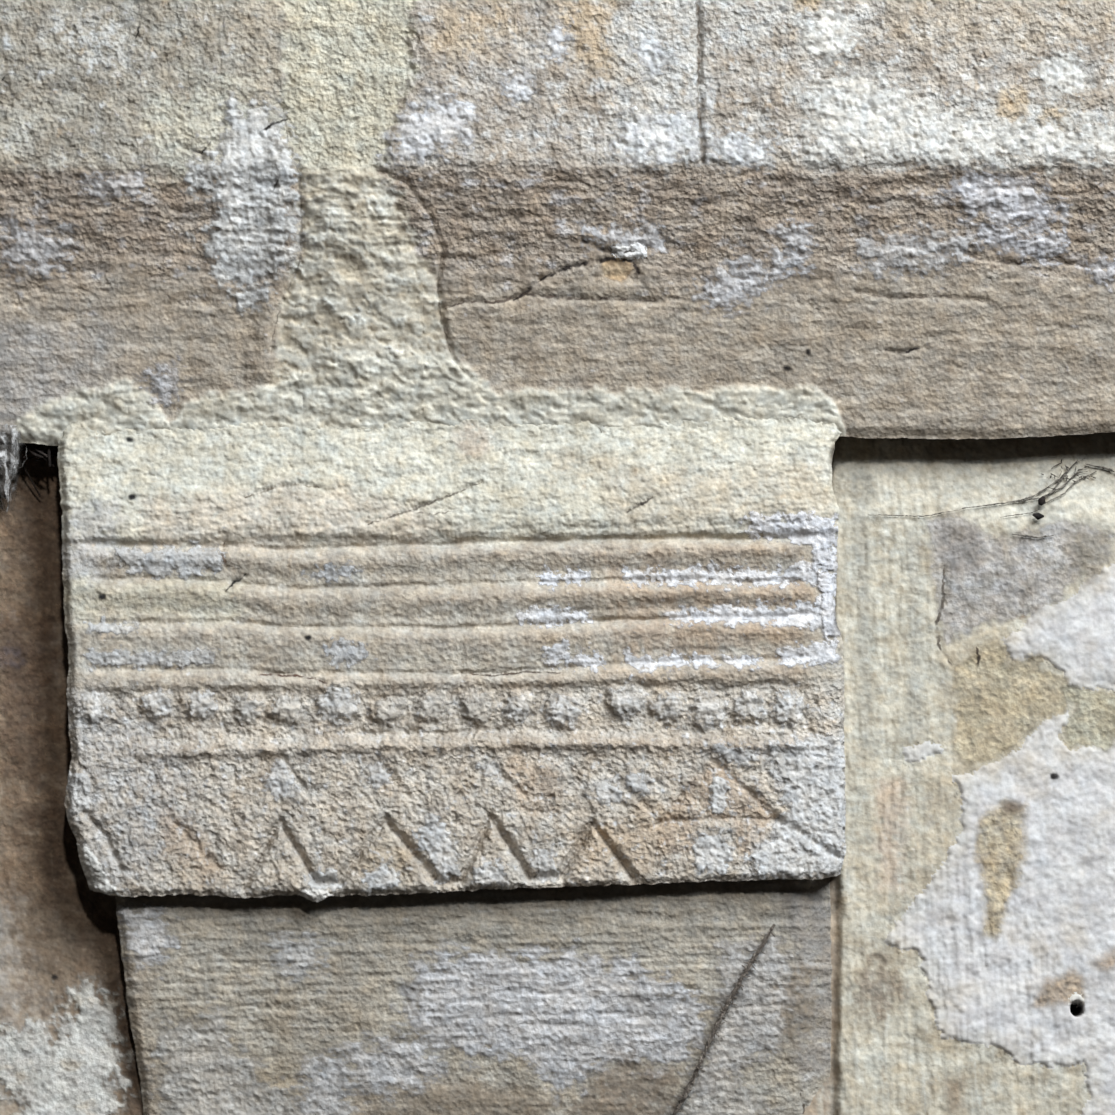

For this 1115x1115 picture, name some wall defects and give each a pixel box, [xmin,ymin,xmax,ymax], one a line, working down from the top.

crack [409,186,653,370]
water stain [110,540,227,580]
water stain [82,615,221,672]
crack [935,567,951,664]
water stain [0,451,143,1115]